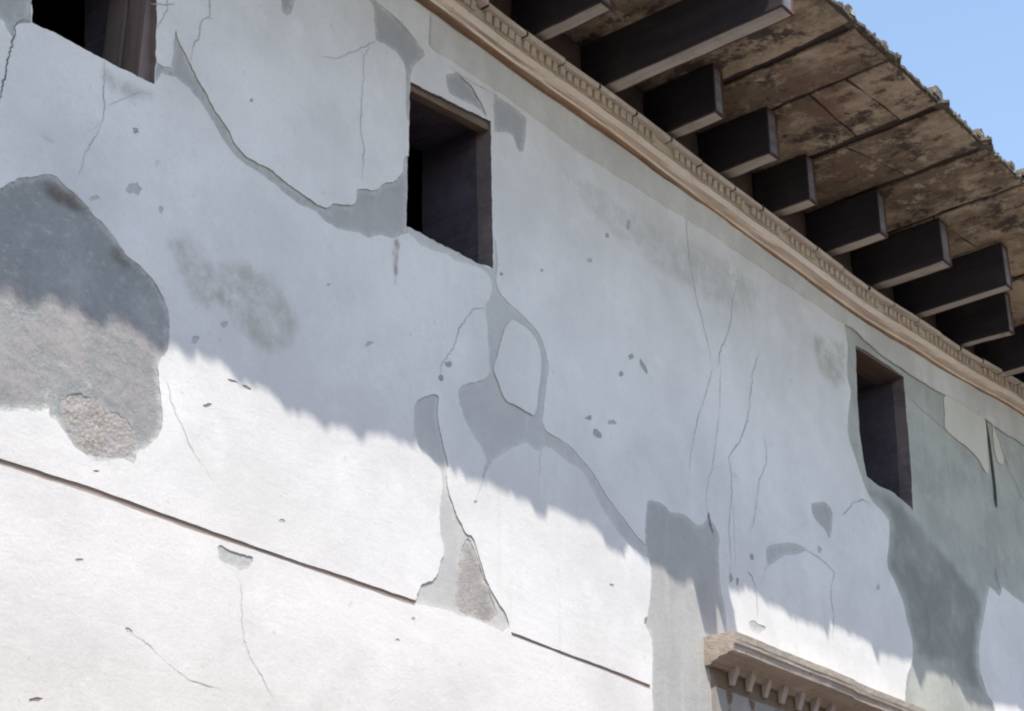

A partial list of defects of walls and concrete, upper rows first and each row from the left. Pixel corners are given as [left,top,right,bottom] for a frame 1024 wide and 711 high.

crack [0,19,28,98]
crack [78,64,141,174]
crack [324,42,375,180]
peeling [369,0,425,120]
spalling [0,174,170,464]
peeling [155,31,739,711]
crack [686,219,768,616]
peeling [845,325,1024,711]
crack [237,574,277,704]